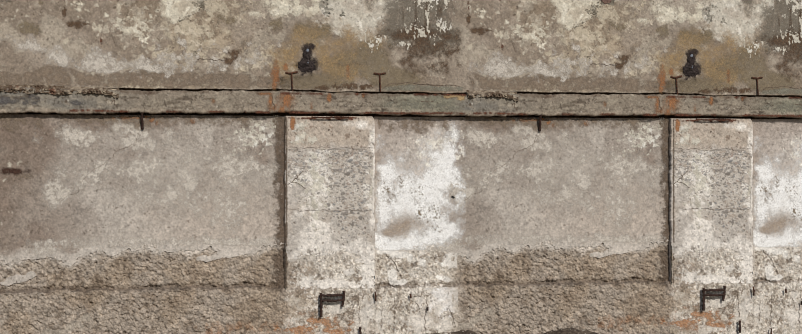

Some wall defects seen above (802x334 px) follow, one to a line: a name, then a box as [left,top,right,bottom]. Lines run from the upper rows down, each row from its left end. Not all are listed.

peeling [0,0,398,99]
leakage [0,0,462,91]
peeling [396,0,456,50]
leakage [458,0,802,94]
peeling [466,0,802,103]
corrosion [256,65,551,130]
corrosion [644,67,802,131]
spalling [0,109,802,334]
corrosion [274,316,354,334]